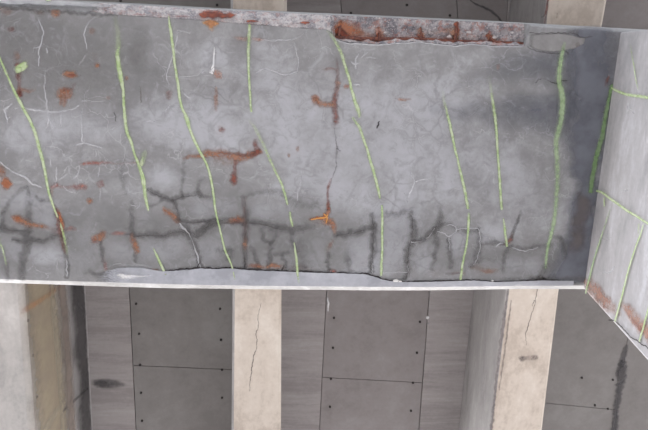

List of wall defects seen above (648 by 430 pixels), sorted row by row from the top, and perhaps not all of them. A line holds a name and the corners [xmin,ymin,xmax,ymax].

spalling [90,3,525,47]
corrosion [313,82,349,123]
corrosion [186,141,262,184]
crack [131,194,561,335]
corrosion [624,305,648,339]
leakage [26,284,121,430]
leakage [612,345,627,430]